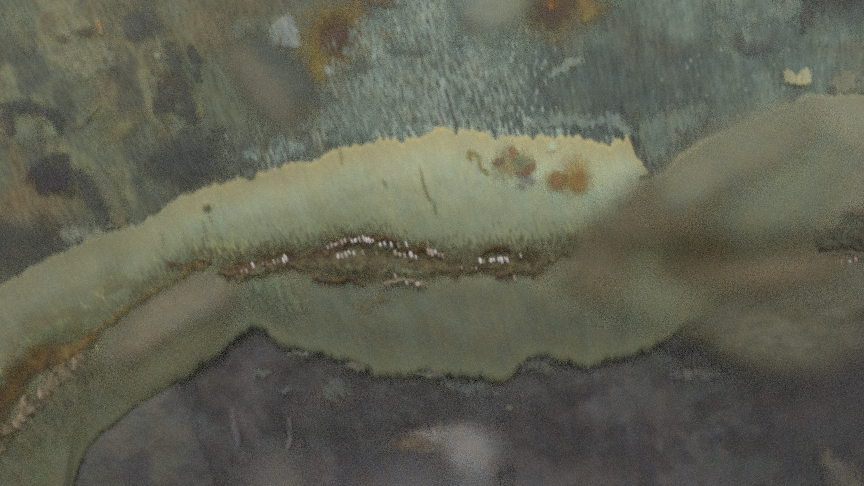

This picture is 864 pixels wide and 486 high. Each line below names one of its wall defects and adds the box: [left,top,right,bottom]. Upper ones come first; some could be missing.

rust [303,0,397,78]
rust [531,0,598,37]
rust [467,146,535,188]
rust [546,157,586,193]